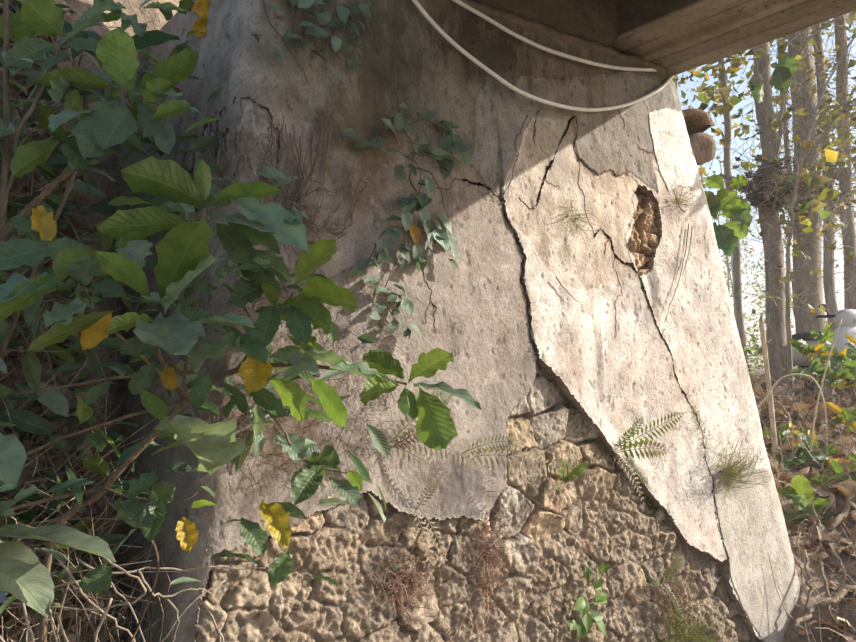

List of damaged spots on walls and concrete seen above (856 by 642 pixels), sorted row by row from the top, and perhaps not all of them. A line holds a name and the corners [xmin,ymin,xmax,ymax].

crack [394,136,479,195]
crack [499,107,642,329]
spalling [625,180,659,275]
crack [423,270,437,328]
spalling [196,363,757,642]